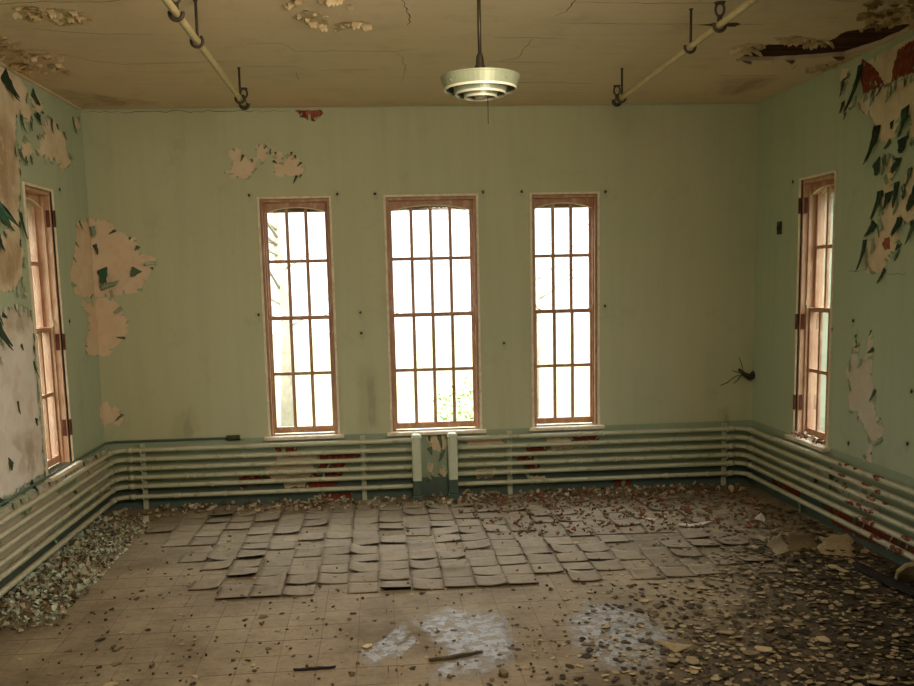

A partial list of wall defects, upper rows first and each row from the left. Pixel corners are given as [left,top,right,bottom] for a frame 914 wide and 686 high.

peeling [10,5,93,27]
peeling [284,0,373,33]
peeling [224,144,306,183]
peeling [730,0,914,283]
peeling [0,35,110,573]
peeling [70,218,158,357]
peeling [845,329,885,464]